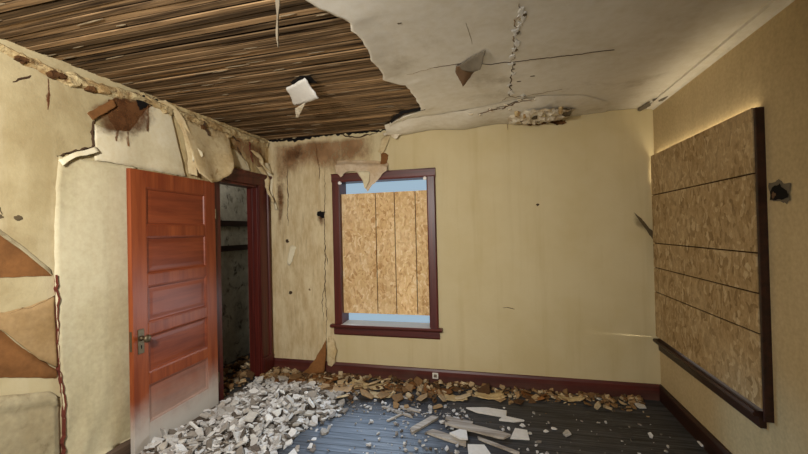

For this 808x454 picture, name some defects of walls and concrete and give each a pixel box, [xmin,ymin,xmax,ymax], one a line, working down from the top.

flaking render [0,0,420,164]
flaking render [455,50,486,86]
crack [468,5,611,116]
flaking render [505,106,575,126]
peeling [231,148,251,171]
leakage [281,139,364,176]
hole [768,179,791,204]